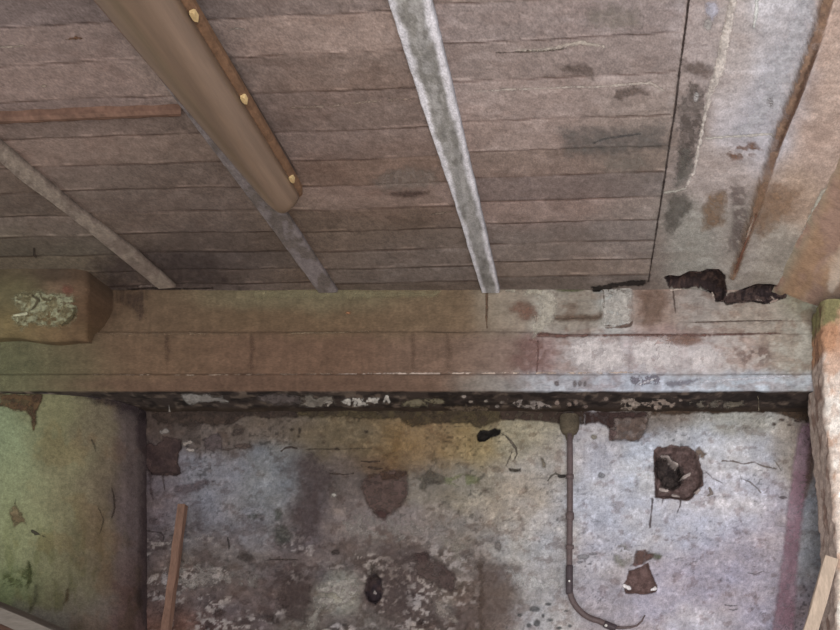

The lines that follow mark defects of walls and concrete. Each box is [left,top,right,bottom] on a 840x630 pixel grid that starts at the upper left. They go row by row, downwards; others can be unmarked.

leakage [663,0,813,231]
crack [648,0,690,282]
spalling [664,269,786,313]
peeling [182,394,229,405]
peeling [256,394,390,407]
peeling [402,395,743,441]
spalling [146,429,194,500]
spalling [649,445,706,528]
spalling [364,565,383,604]
spalling [615,548,661,595]